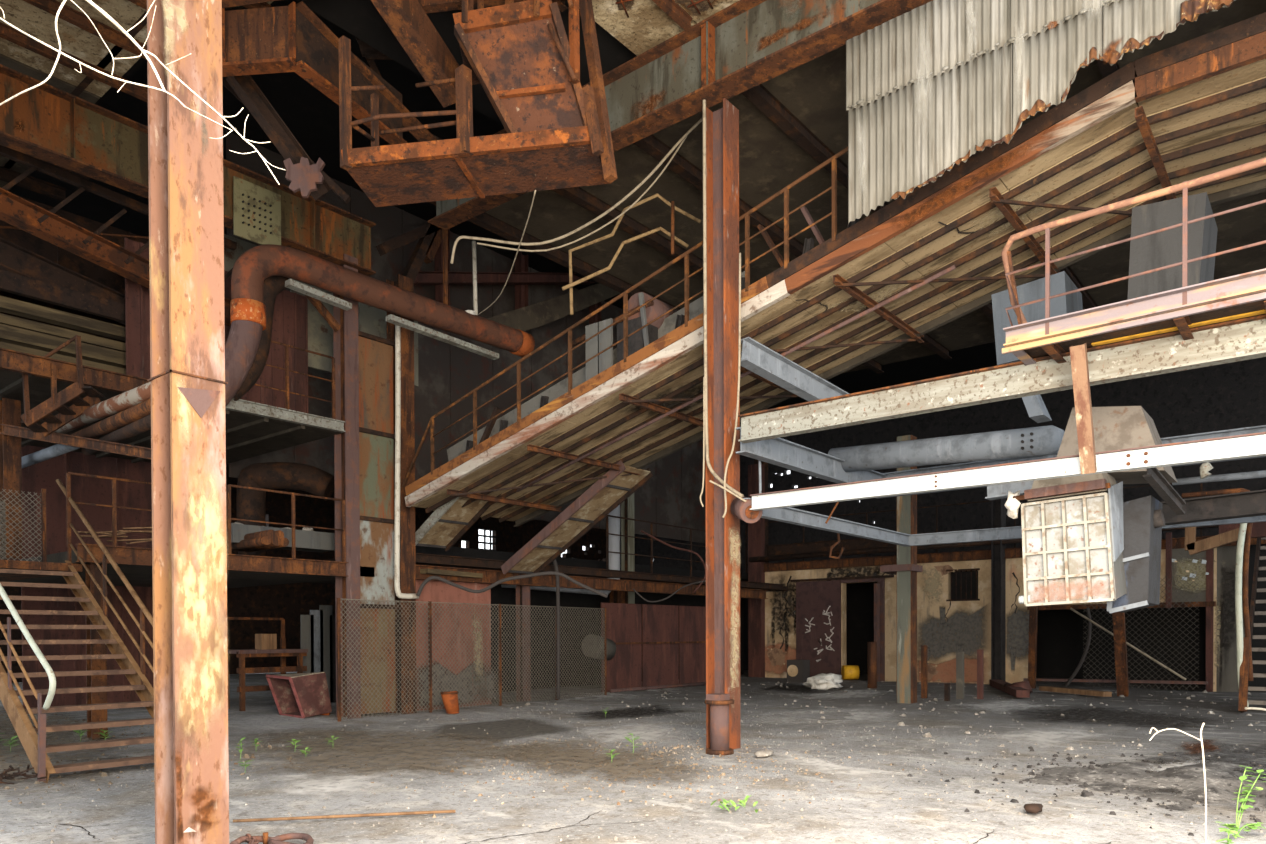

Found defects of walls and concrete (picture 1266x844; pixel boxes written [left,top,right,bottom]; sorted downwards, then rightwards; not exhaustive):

spalling [675,0,723,20]
corrosion [891,0,1234,199]
water stain [918,570,985,683]
water stain [257,687,696,795]
corrosion [175,757,215,840]